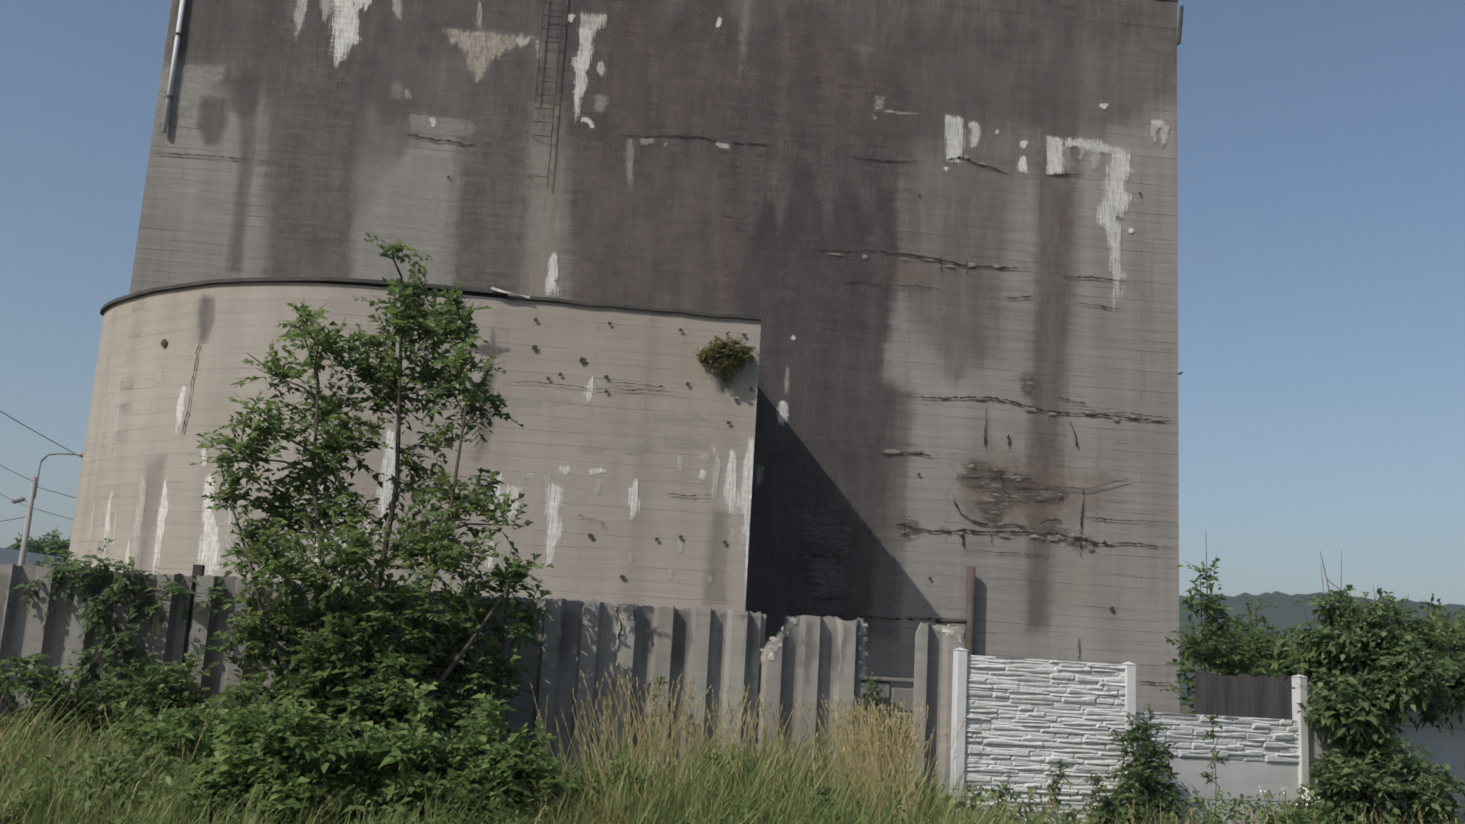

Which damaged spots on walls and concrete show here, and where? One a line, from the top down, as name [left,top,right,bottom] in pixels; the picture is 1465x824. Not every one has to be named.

crack [801,249,1130,309]
damp [172,0,1177,635]
crack [893,394,1178,450]
crack [895,485,1176,557]
spalling [956,458,1129,551]